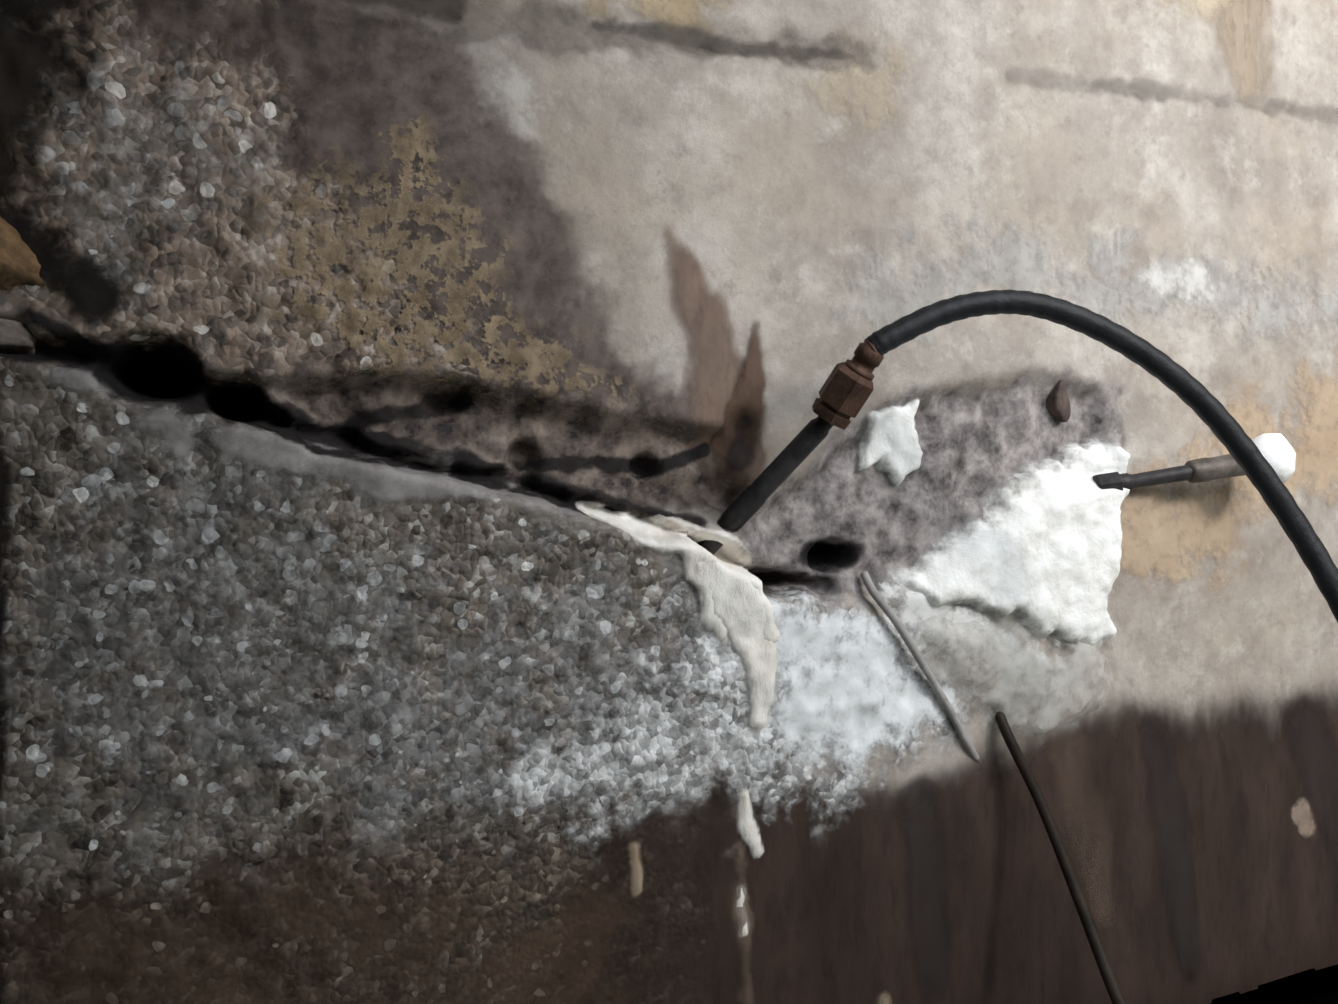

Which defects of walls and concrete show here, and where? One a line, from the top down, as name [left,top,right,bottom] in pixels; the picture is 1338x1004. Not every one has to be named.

water stain [128,0,698,484]
crack [0,308,108,371]
crack [158,381,710,528]
efflorescence [860,399,923,486]
water stain [261,440,1338,1004]